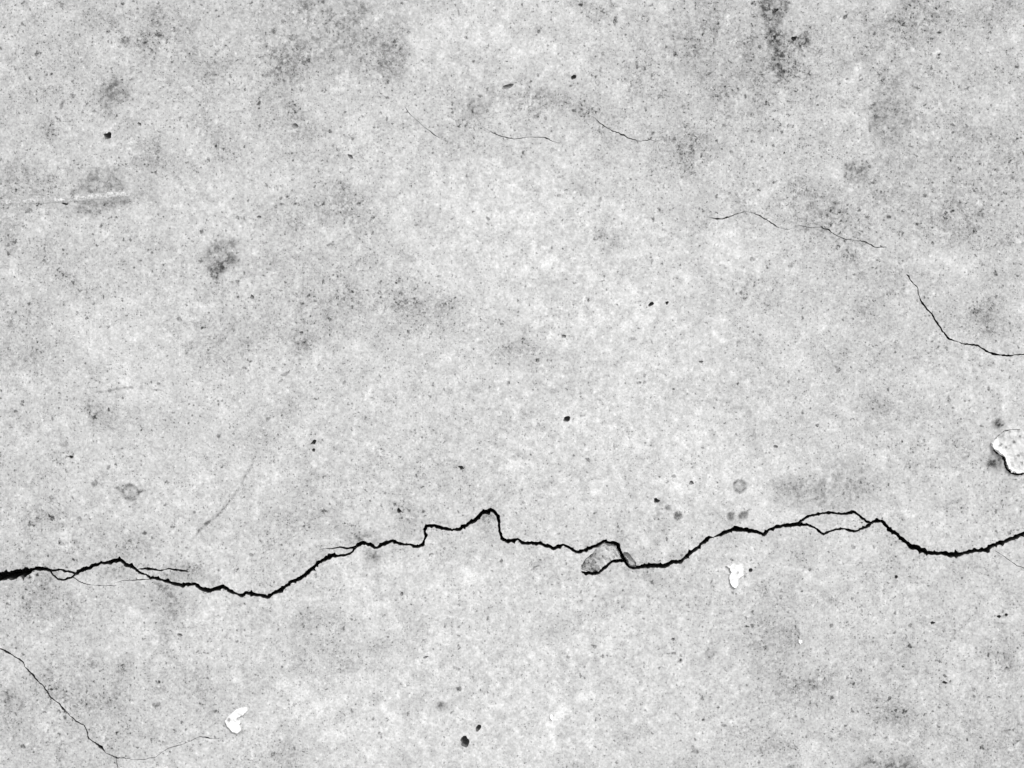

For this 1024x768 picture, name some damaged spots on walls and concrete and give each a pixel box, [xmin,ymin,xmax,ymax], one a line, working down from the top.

crack [906,274,1024,357]
peeling [991,429,1024,475]
crack [0,508,1024,599]
crack [0,648,219,767]
peeling [225,707,247,734]